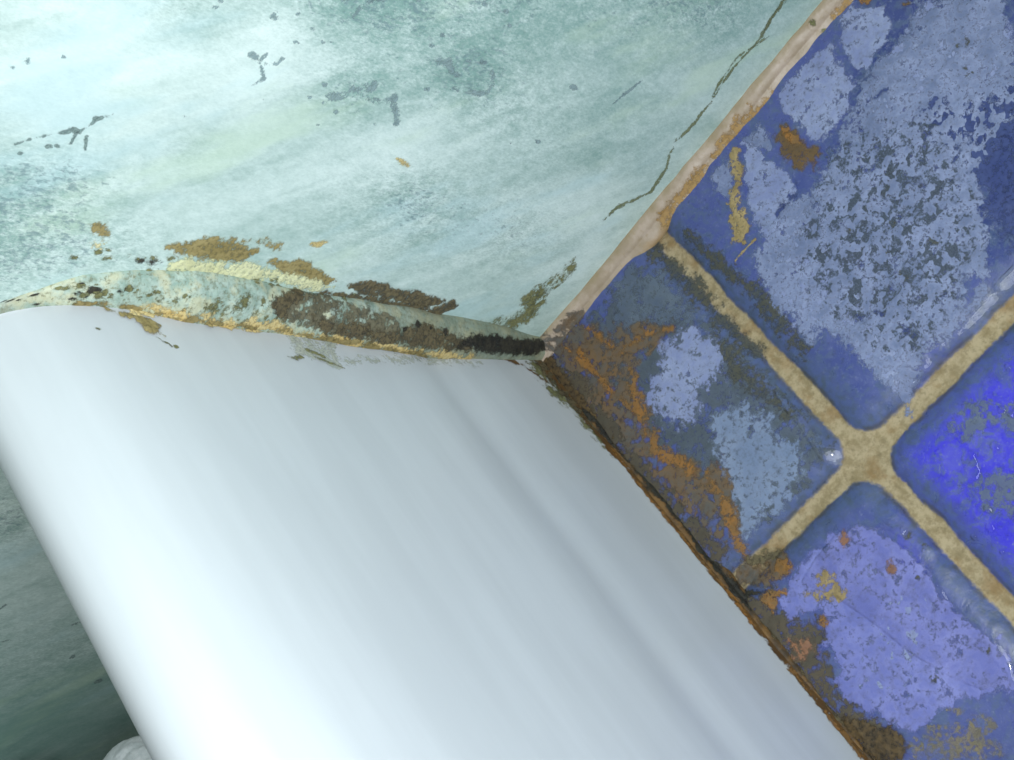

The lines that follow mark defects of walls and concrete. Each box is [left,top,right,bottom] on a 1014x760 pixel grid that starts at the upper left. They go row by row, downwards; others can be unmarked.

corrosion [830,0,871,20]
crack [604,0,786,220]
corrosion [775,123,822,172]
corrosion [657,90,773,262]
peeling [136,316,179,348]
peeling [291,348,345,369]
corrosion [543,310,882,730]